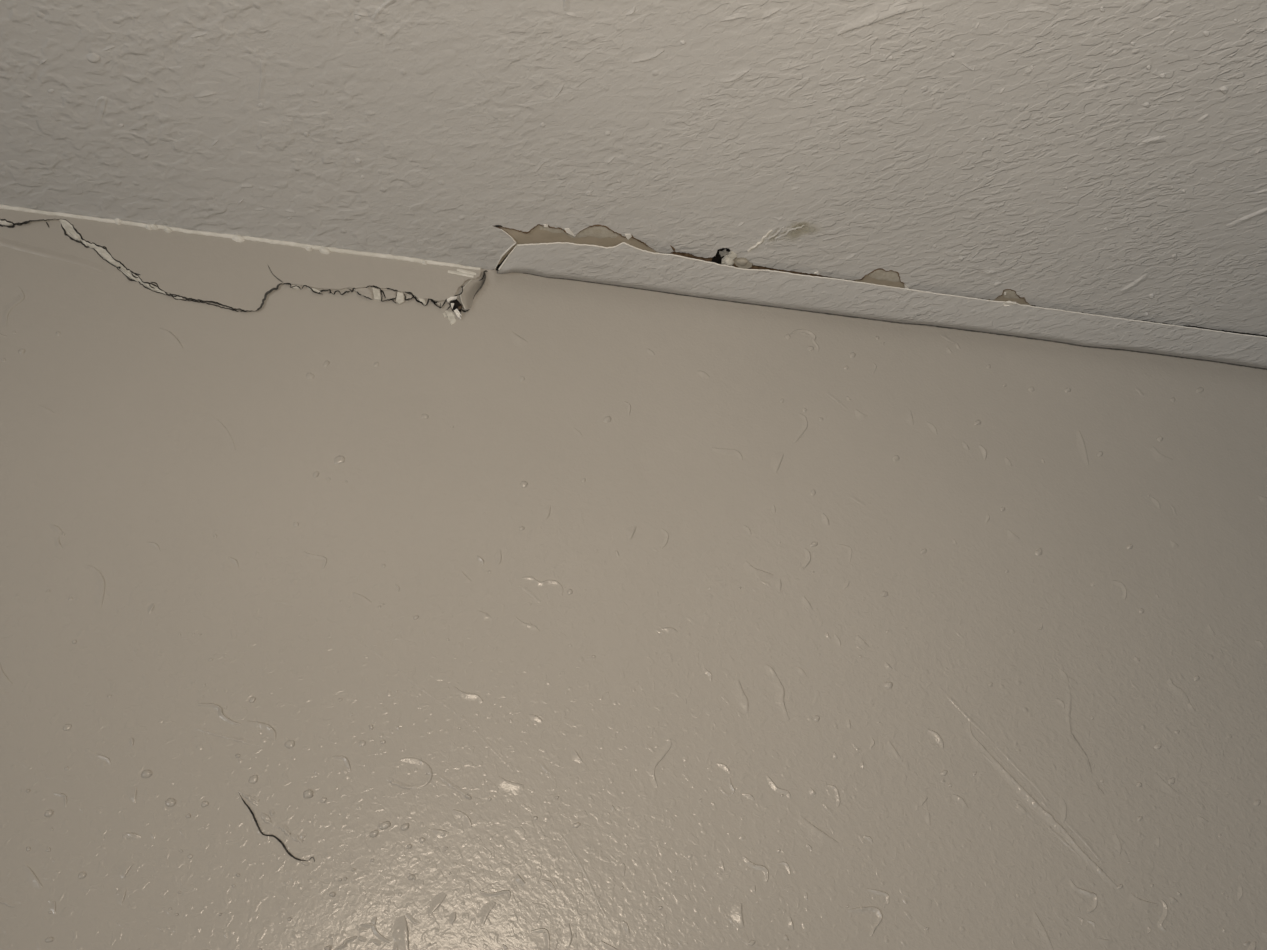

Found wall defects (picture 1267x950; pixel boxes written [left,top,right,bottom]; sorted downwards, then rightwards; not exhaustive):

crack [0,219,470,314]
peeling [0,209,1267,369]